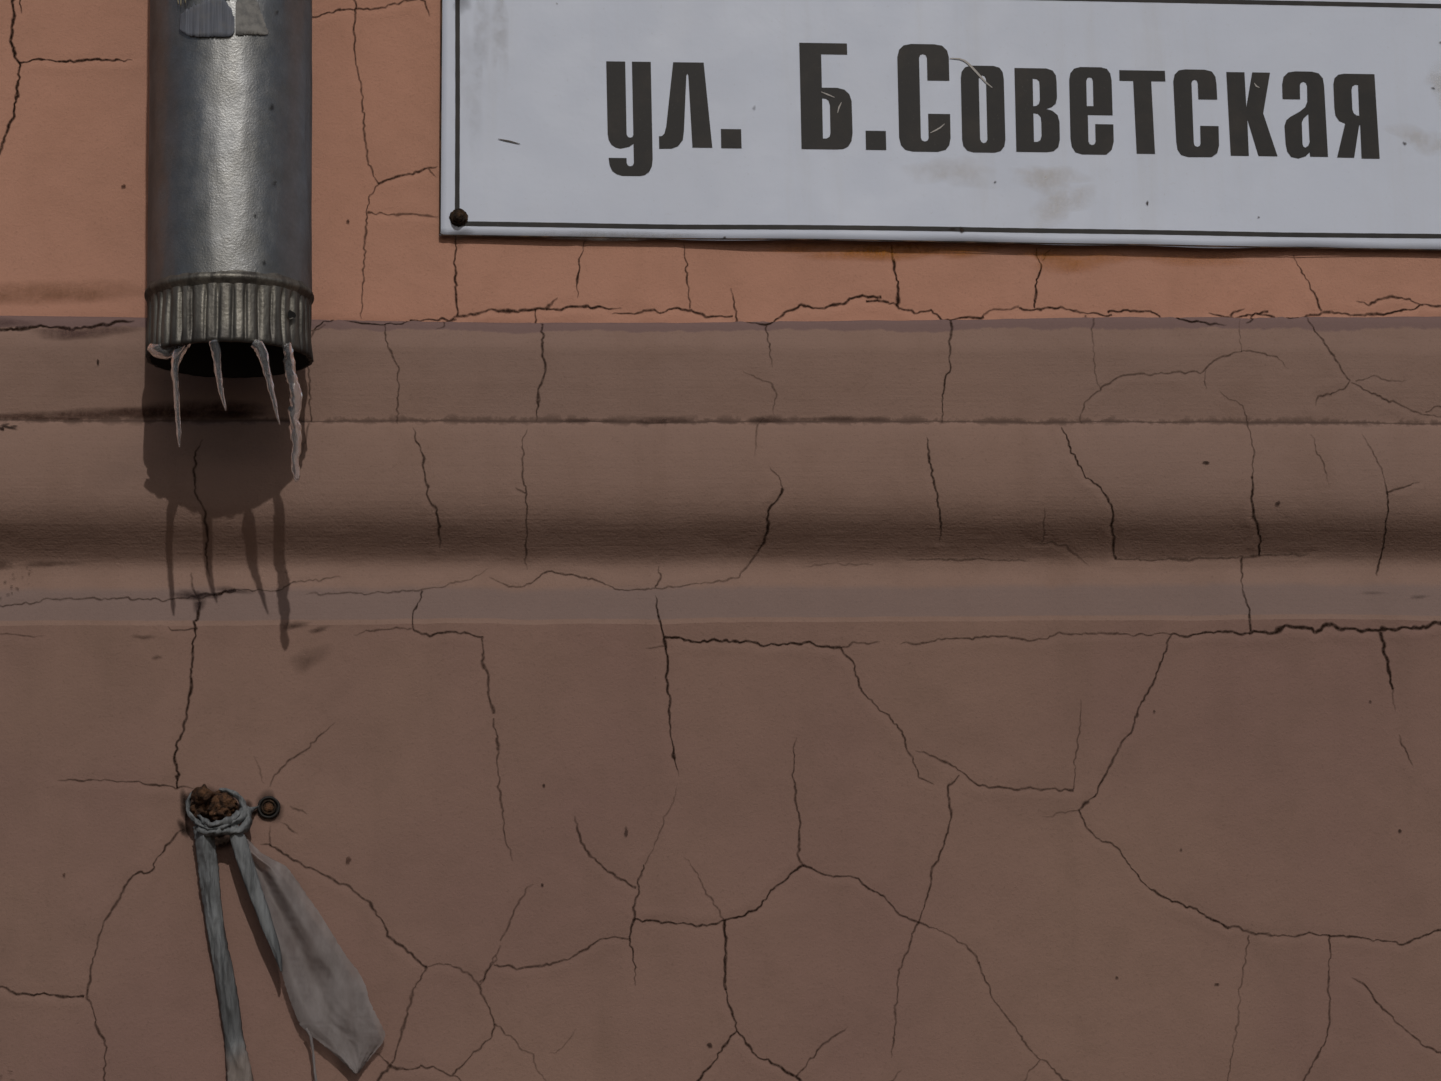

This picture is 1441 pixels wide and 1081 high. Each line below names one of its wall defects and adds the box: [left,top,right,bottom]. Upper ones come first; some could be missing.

crack [0,0,126,153]
crack [0,320,131,331]
crack [311,0,1441,530]
crack [70,450,290,789]
crack [377,429,1441,1081]
crack [106,833,177,918]
crack [270,845,449,976]
crack [0,952,107,1081]